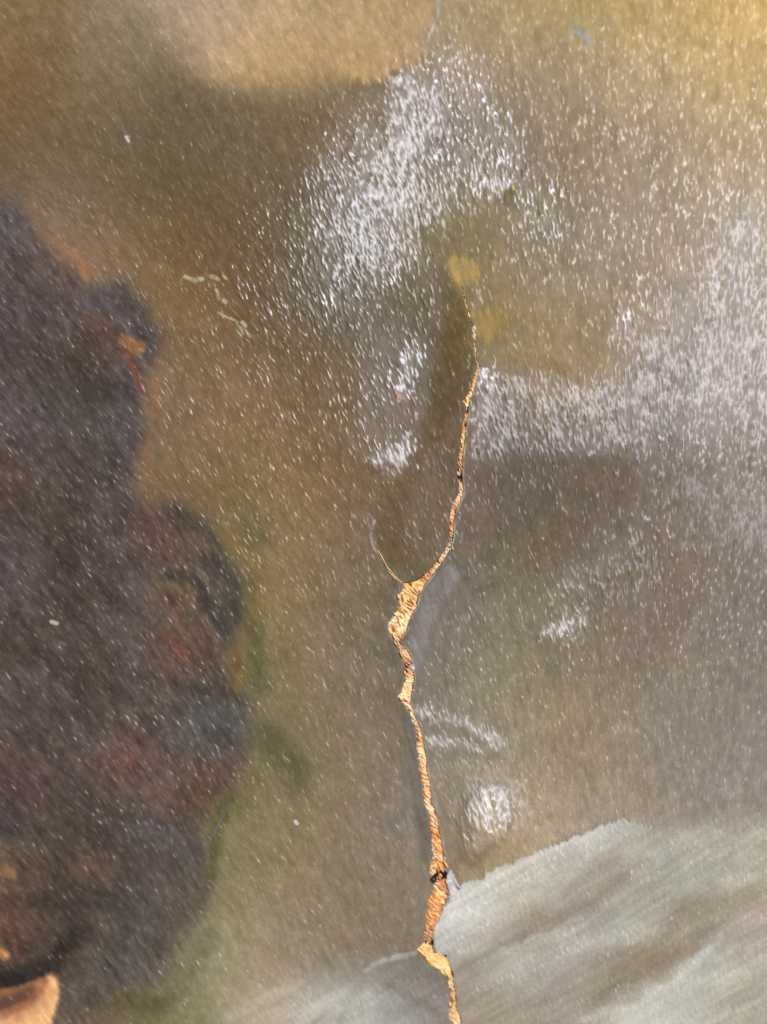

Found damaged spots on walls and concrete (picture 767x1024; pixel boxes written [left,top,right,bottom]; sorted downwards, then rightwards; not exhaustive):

leakage [448,255,480,293]
crack [370,287,480,1024]